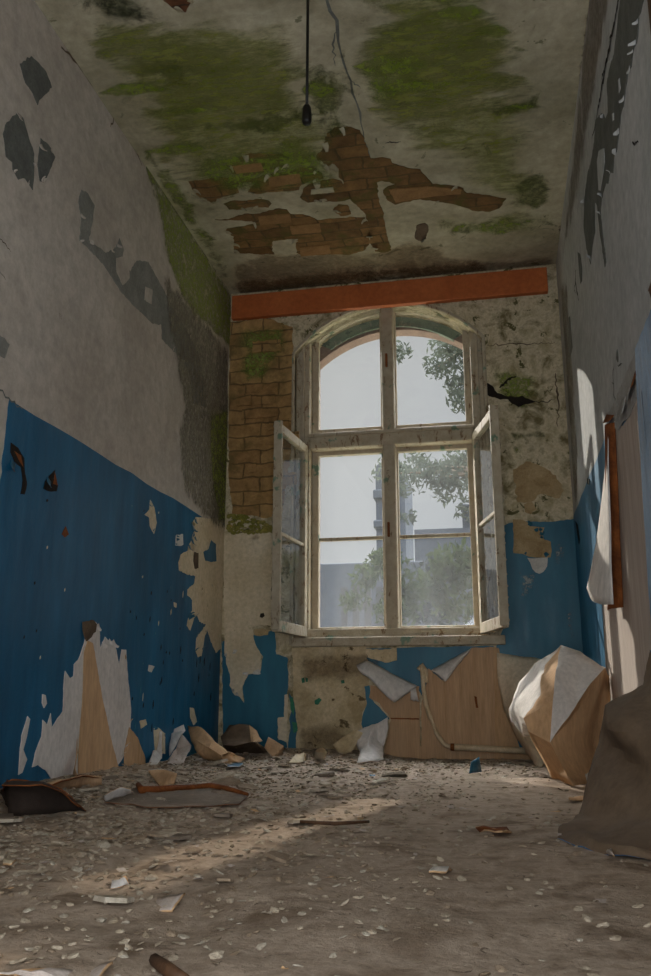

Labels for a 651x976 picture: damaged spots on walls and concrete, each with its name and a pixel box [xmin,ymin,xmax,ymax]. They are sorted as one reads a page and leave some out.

flaking render [163,0,194,13]
spalling [20,56,52,105]
crack [592,0,619,136]
spalling [3,111,55,190]
spalling [578,0,644,284]
flaking render [188,126,506,257]
spalling [78,190,206,407]
spalling [131,500,159,534]
flaking render [167,318,309,699]
peeling [504,516,552,574]
spalling [502,461,564,503]
spalling [18,716,30,775]